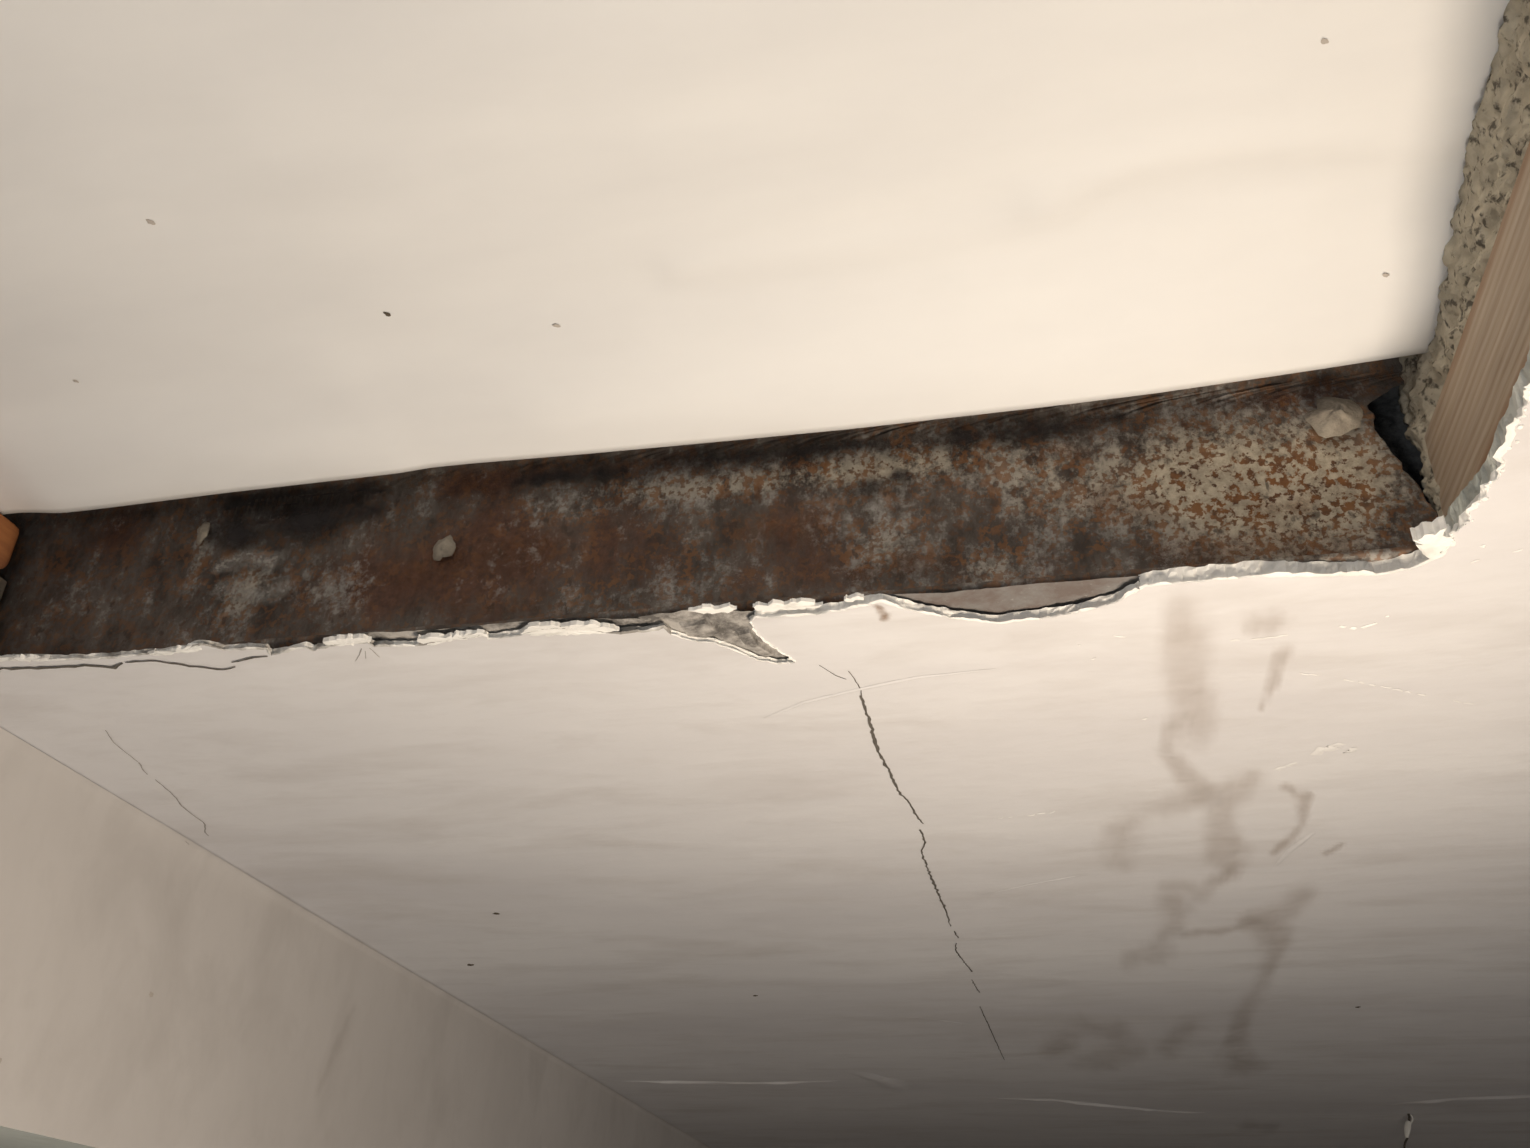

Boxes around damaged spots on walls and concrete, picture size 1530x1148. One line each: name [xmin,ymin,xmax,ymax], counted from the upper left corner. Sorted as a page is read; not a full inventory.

spalling [0,349,1530,665]
crack [105,730,207,844]
crack [819,665,1005,1060]